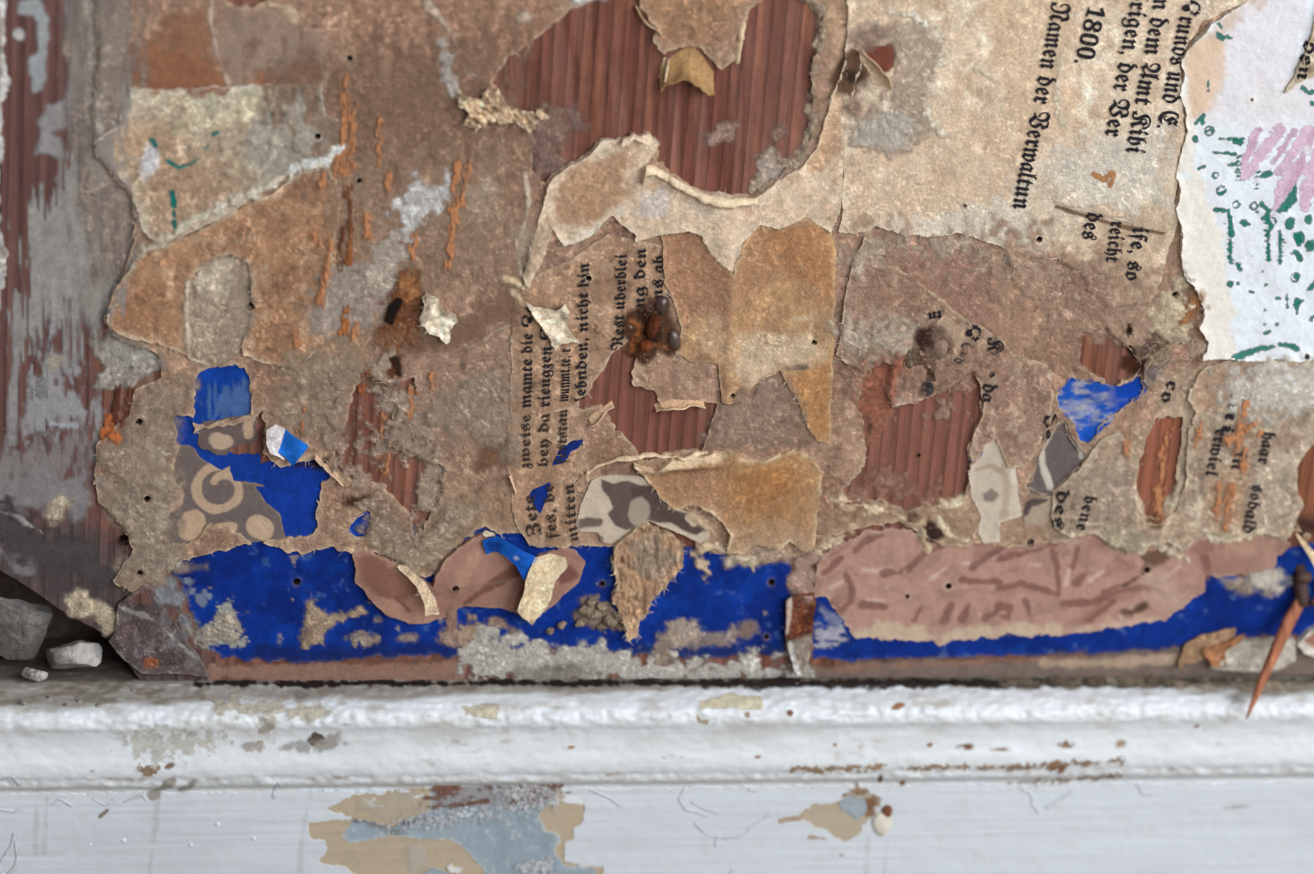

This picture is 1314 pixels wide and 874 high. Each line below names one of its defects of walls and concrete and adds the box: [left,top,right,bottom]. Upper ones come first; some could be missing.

peeling [13,0,49,92]
peeling [704,121,738,146]
peeling [512,102,573,278]
peeling [417,293,458,344]
peeling [825,312,921,367]
peeling [266,424,330,468]
peeling [937,495,969,543]
peeling [1201,517,1314,543]
peeling [785,592,816,676]
peeling [214,694,331,751]
peeling [308,784,621,874]
peeling [779,782,880,856]